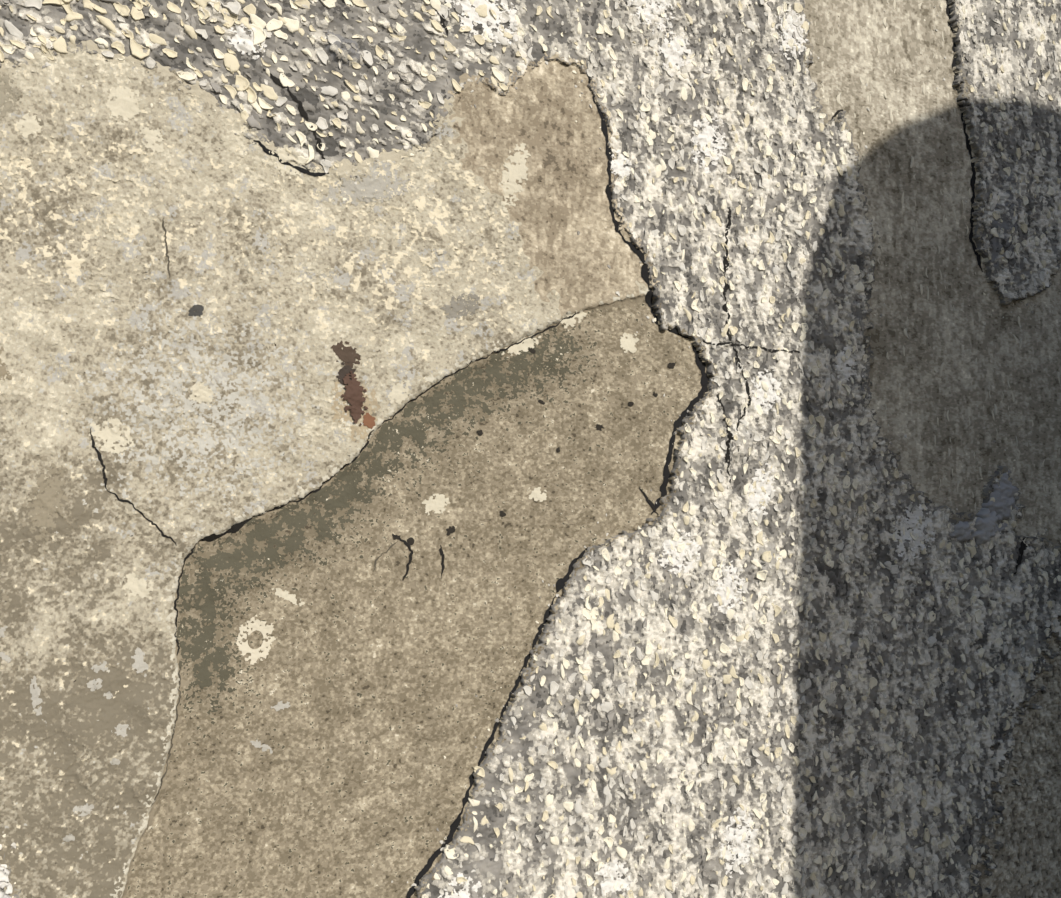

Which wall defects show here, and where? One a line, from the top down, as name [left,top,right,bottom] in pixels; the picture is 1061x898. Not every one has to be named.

peeling [535,1,569,37]
peeling [673,0,718,25]
peeling [420,52,448,82]
rust [331,371,380,443]
peeling [773,372,809,418]
crack [90,312,578,806]
peeling [0,736,68,827]
peeling [110,737,150,786]
crack [406,547,588,898]
peeling [551,641,669,815]
peeling [675,731,770,865]
peeling [493,823,528,867]